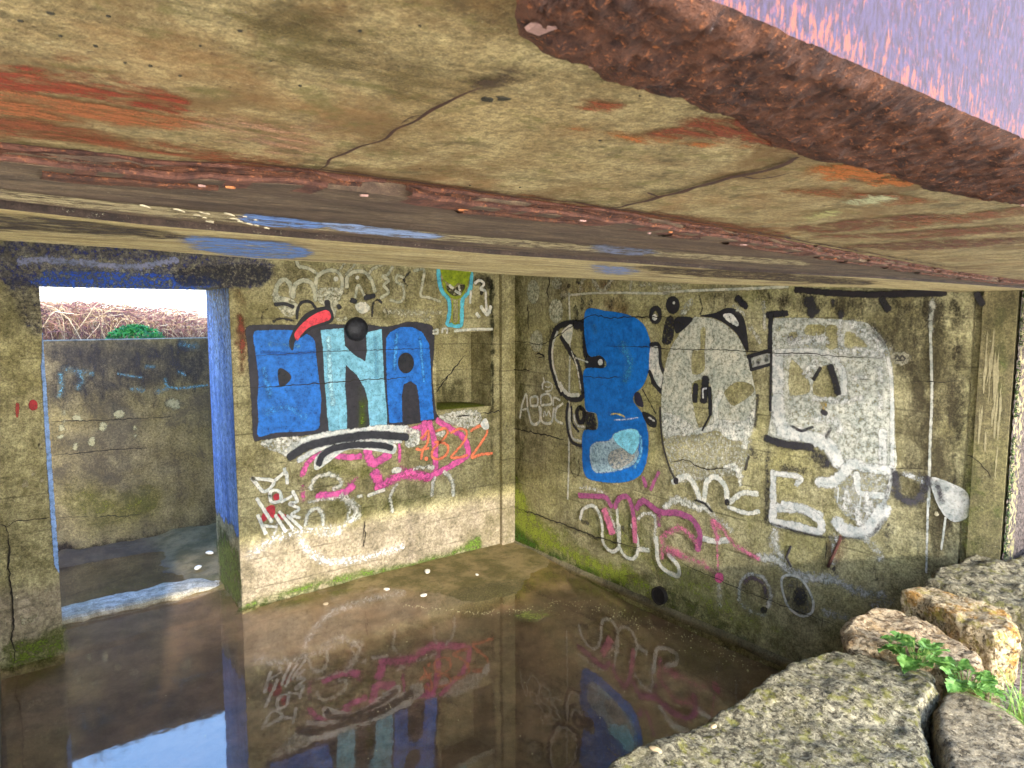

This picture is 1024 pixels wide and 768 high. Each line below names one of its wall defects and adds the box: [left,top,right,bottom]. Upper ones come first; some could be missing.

crack [2,88,957,269]
corrosion [0,57,1024,286]
crack [0,514,139,664]